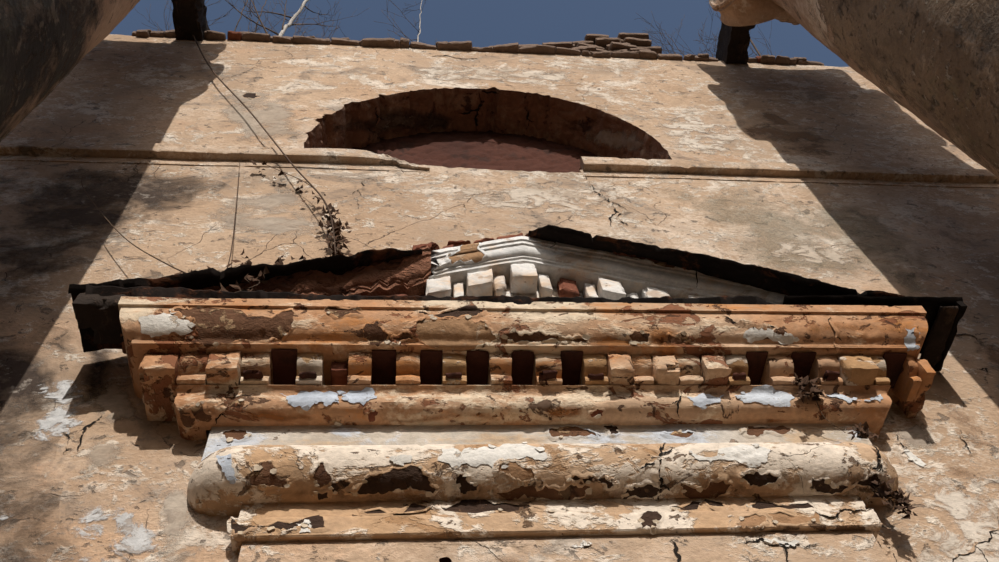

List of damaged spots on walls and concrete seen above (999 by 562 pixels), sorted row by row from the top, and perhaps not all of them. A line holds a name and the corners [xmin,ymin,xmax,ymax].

crack [583,175,627,232]
peeling [412,233,532,267]
peeling [139,305,299,349]
peeling [323,305,591,354]
peeling [625,329,652,346]
peeling [280,387,380,423]
peeling [687,385,795,410]
crack [63,409,112,455]
peeling [308,407,884,547]
peeling [227,514,331,538]
crack [670,539,681,562]
crack [951,515,999,562]